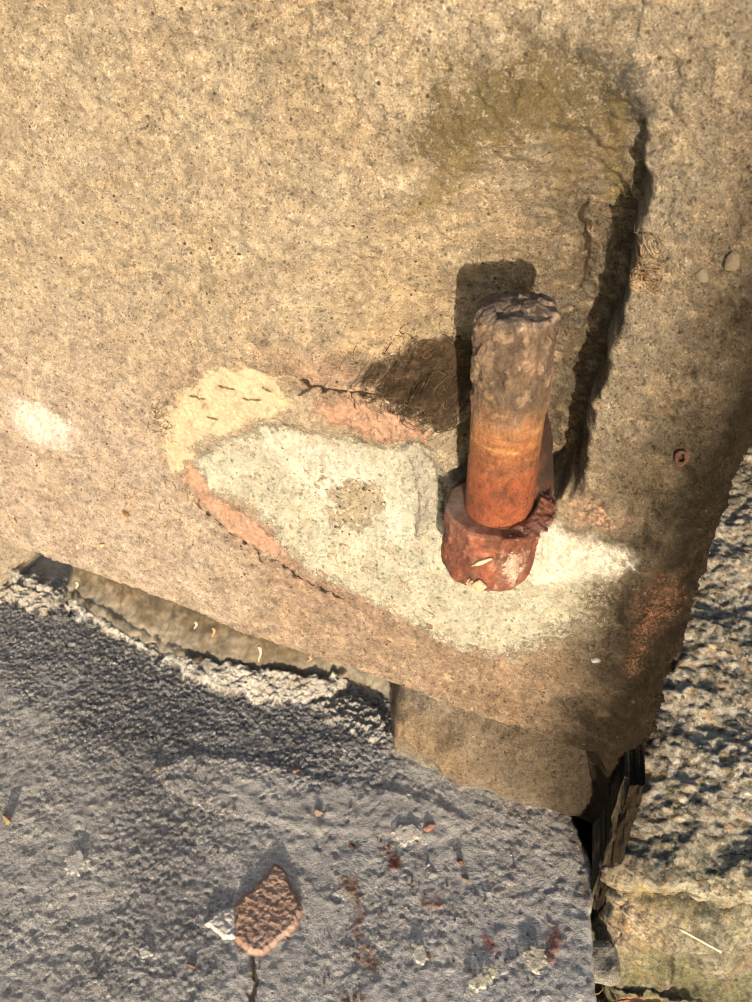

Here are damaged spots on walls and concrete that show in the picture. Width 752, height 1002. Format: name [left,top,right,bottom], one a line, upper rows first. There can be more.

water stain [402,21,655,218]
peeling [311,397,432,447]
peeling [155,362,294,558]
spalling [323,478,386,535]
rust [499,492,624,542]